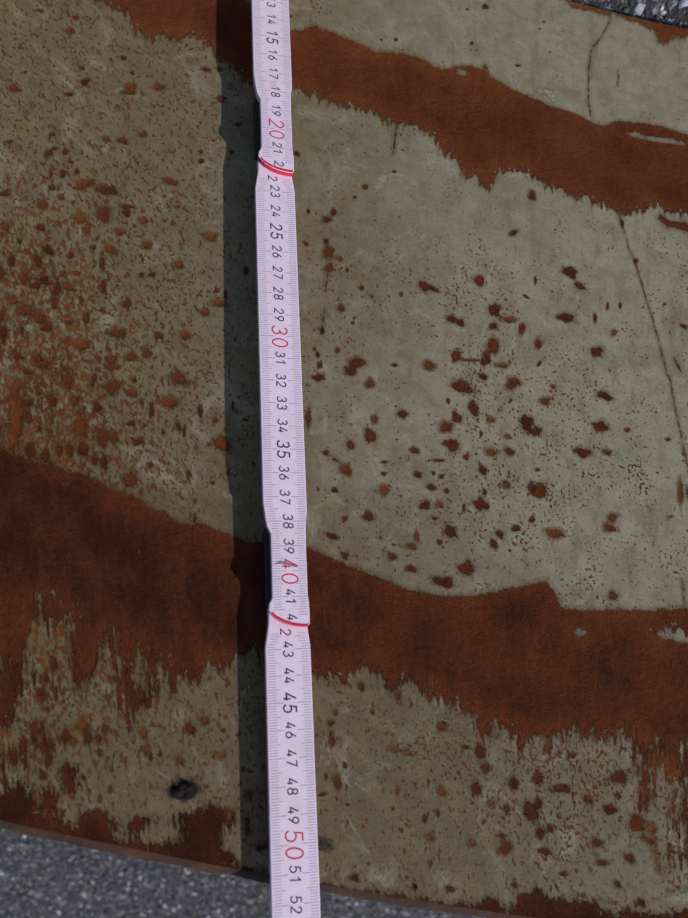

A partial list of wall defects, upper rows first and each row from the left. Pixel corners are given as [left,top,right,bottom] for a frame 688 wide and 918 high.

corrosion [0,0,269,874]
corrosion [289,0,688,918]
crack [588,18,611,115]